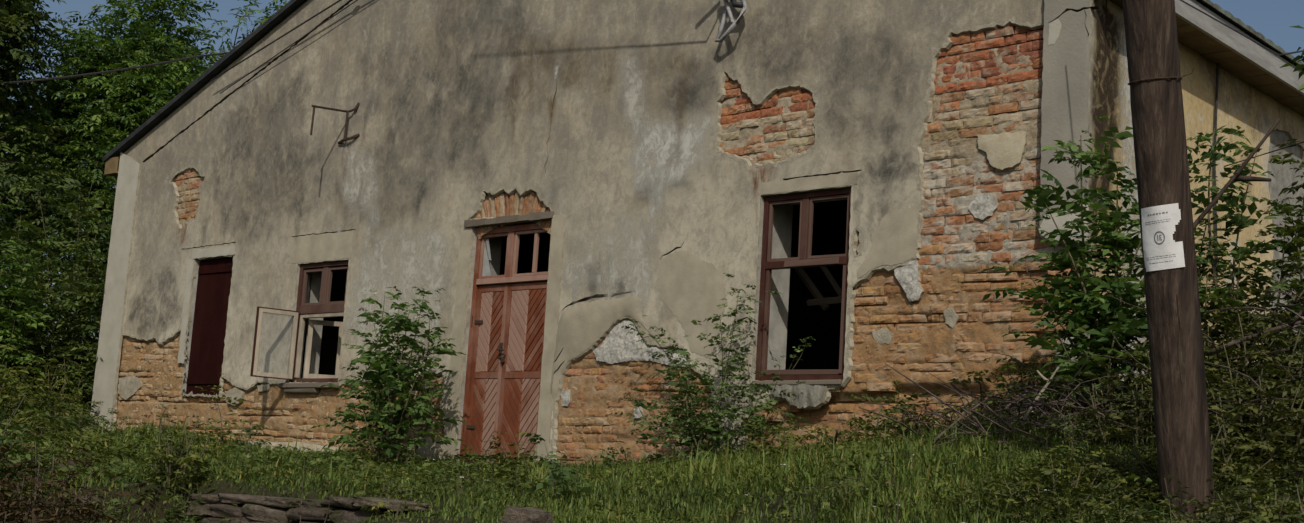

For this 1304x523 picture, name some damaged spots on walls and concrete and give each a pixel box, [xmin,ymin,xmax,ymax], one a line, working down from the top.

flaking render [168,165,206,231]
flaking render [112,321,445,463]
leakage [341,144,449,359]
flaking render [467,186,552,242]
leakage [564,54,711,303]
flaking render [550,249,728,466]
flaking render [714,70,819,172]
flaking render [738,16,1094,453]